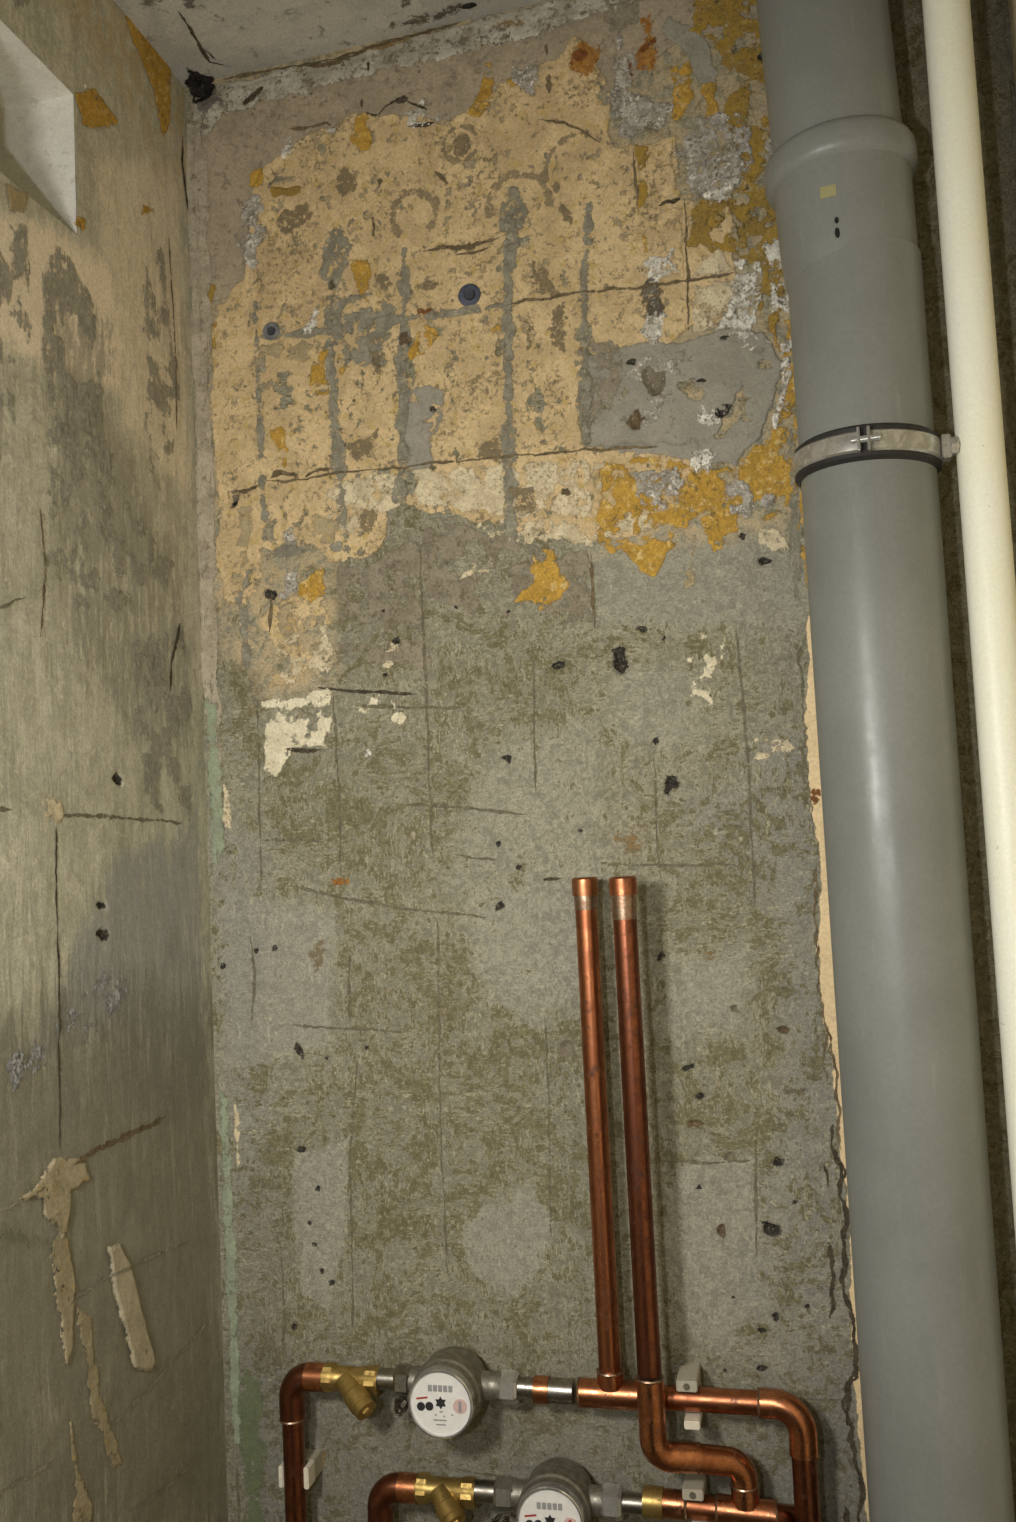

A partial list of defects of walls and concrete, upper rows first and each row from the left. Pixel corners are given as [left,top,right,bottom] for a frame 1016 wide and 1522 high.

corrosion [568,40,602,76]
corrosion [627,11,659,76]
peeling [207,0,808,777]
crack [237,445,659,494]
peeling [19,1156,122,1468]
peeling [107,1243,155,1372]
peeling [69,1420,93,1522]